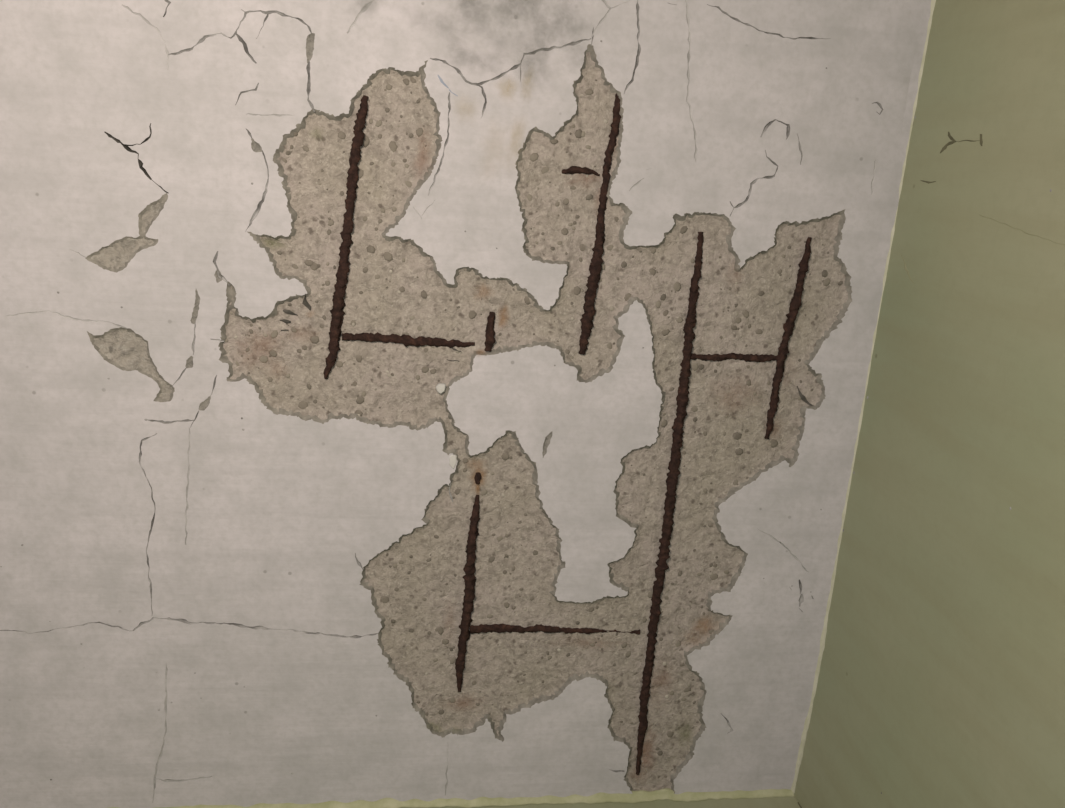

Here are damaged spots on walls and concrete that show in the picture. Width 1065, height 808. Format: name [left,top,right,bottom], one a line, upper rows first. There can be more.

crack [104,123,168,193]
crack [122,0,315,232]
peeling [306,33,315,63]
crack [413,0,641,219]
crack [667,0,831,161]
crack [730,120,803,216]
peeling [85,193,168,273]
crack [213,251,230,286]
crack [280,294,311,331]
peeling [87,327,175,402]
spalling [214,44,852,794]
crack [0,375,378,638]